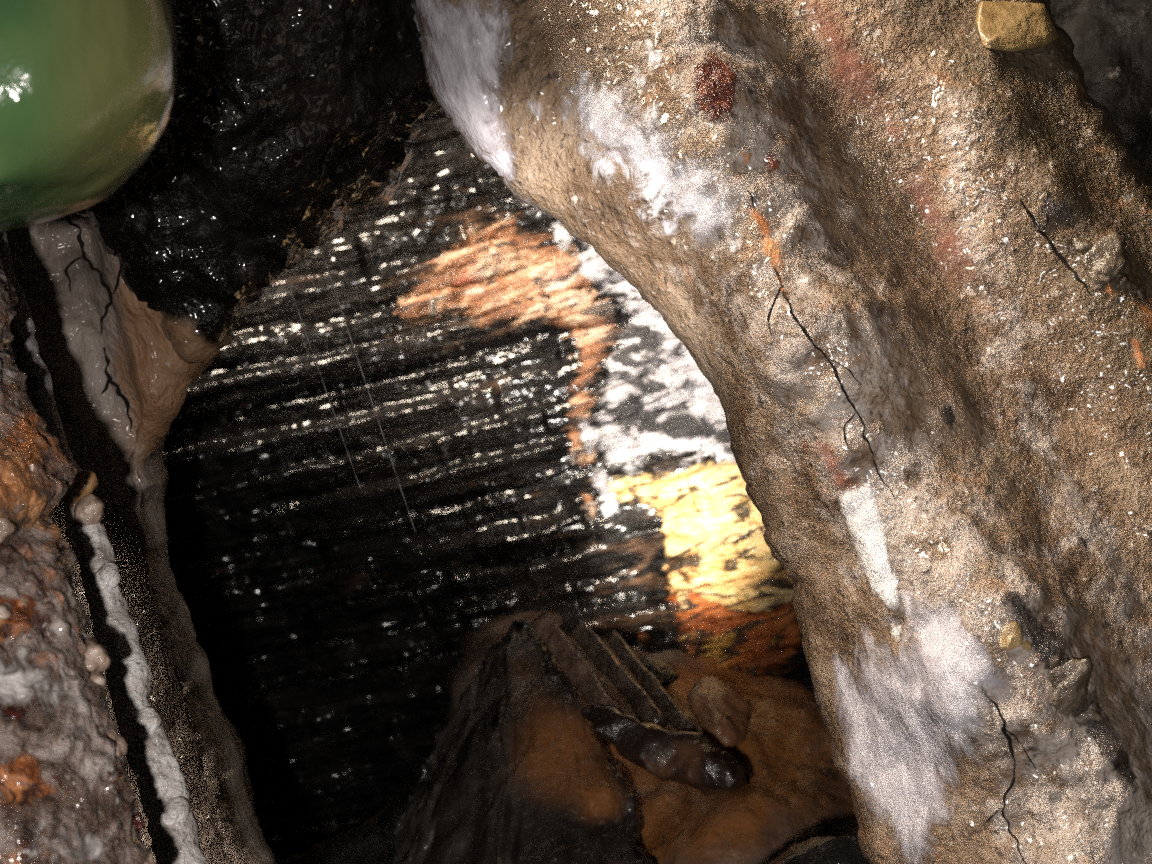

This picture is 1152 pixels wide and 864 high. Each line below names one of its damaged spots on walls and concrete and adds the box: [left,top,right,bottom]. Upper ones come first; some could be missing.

crack [64,214,133,432]
efflorescence [411,0,544,213]
rust [393,217,622,466]
efflorescence [552,223,736,517]
efflorescence [564,72,739,251]
rust [685,49,740,123]
crack [747,190,895,499]
crack [1019,191,1090,294]
rust [581,494,599,521]
rust [0,752,67,806]
efflorescence [834,484,1003,864]
crack [980,680,1038,861]